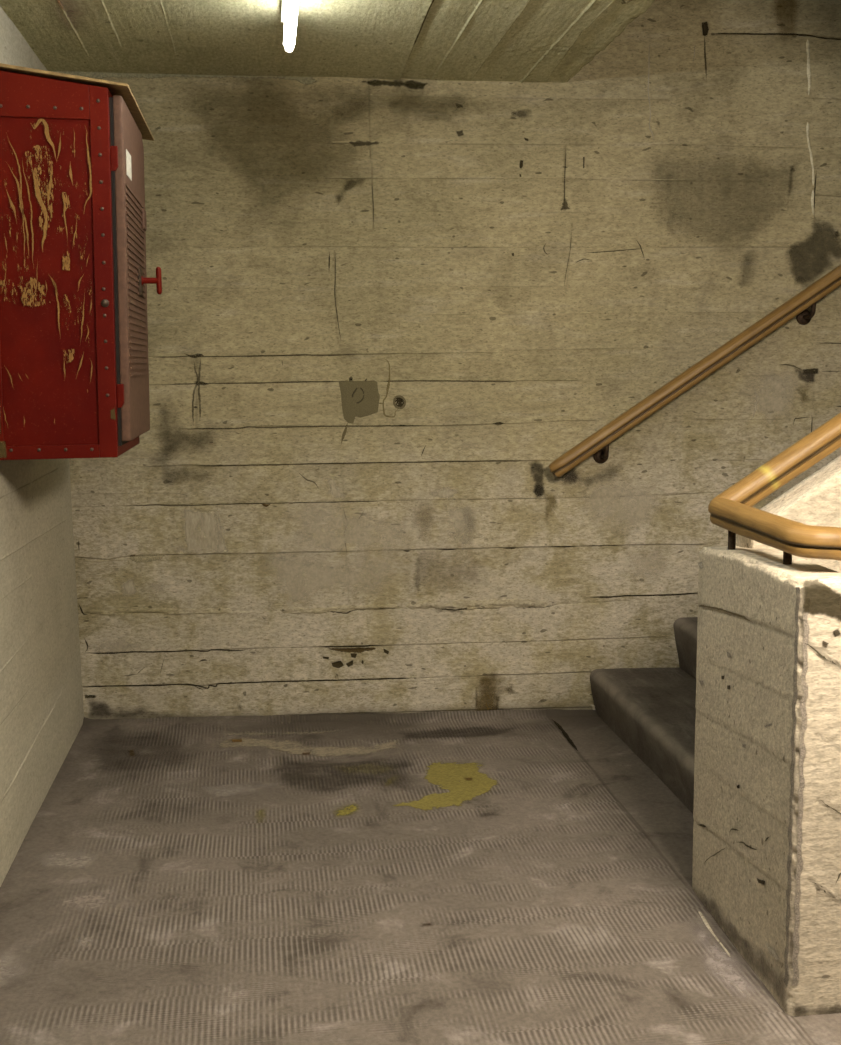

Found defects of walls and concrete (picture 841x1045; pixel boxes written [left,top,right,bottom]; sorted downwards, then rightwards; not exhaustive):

water stain [363,80,427,89]
water stain [788,122,841,284]
water stain [531,463,555,514]